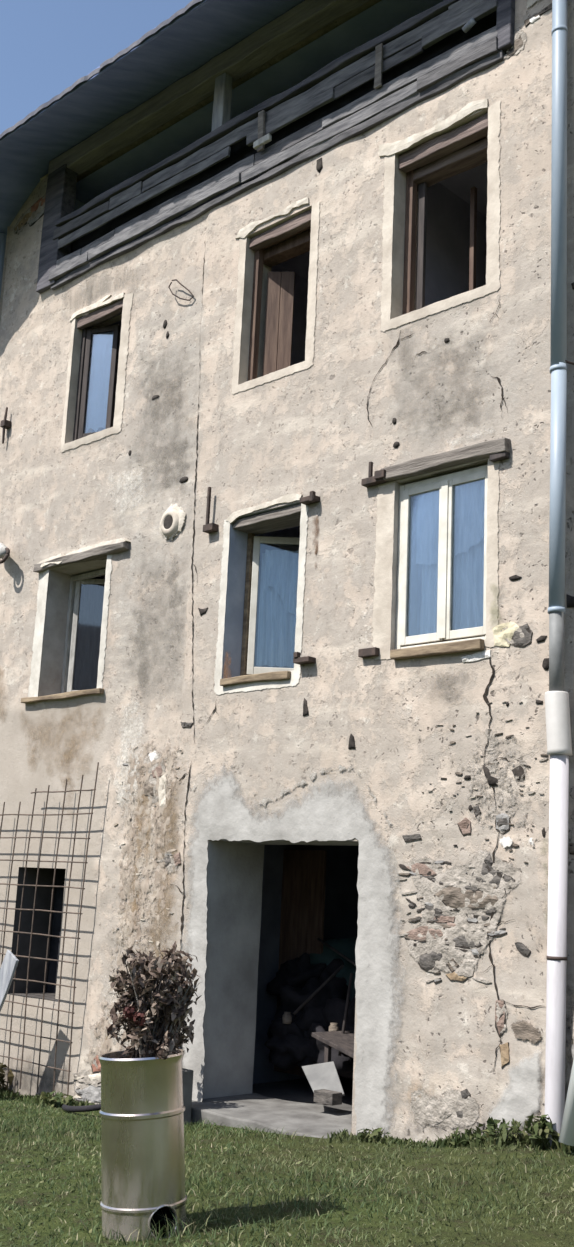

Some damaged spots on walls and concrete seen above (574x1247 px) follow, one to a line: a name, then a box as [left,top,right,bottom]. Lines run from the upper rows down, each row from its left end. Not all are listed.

crack [367,330,427,424]
crack [491,376,506,417]
crack [170,343,216,955]
spalling [72,722,193,1104]
spalling [396,719,548,984]
crack [482,658,545,1071]